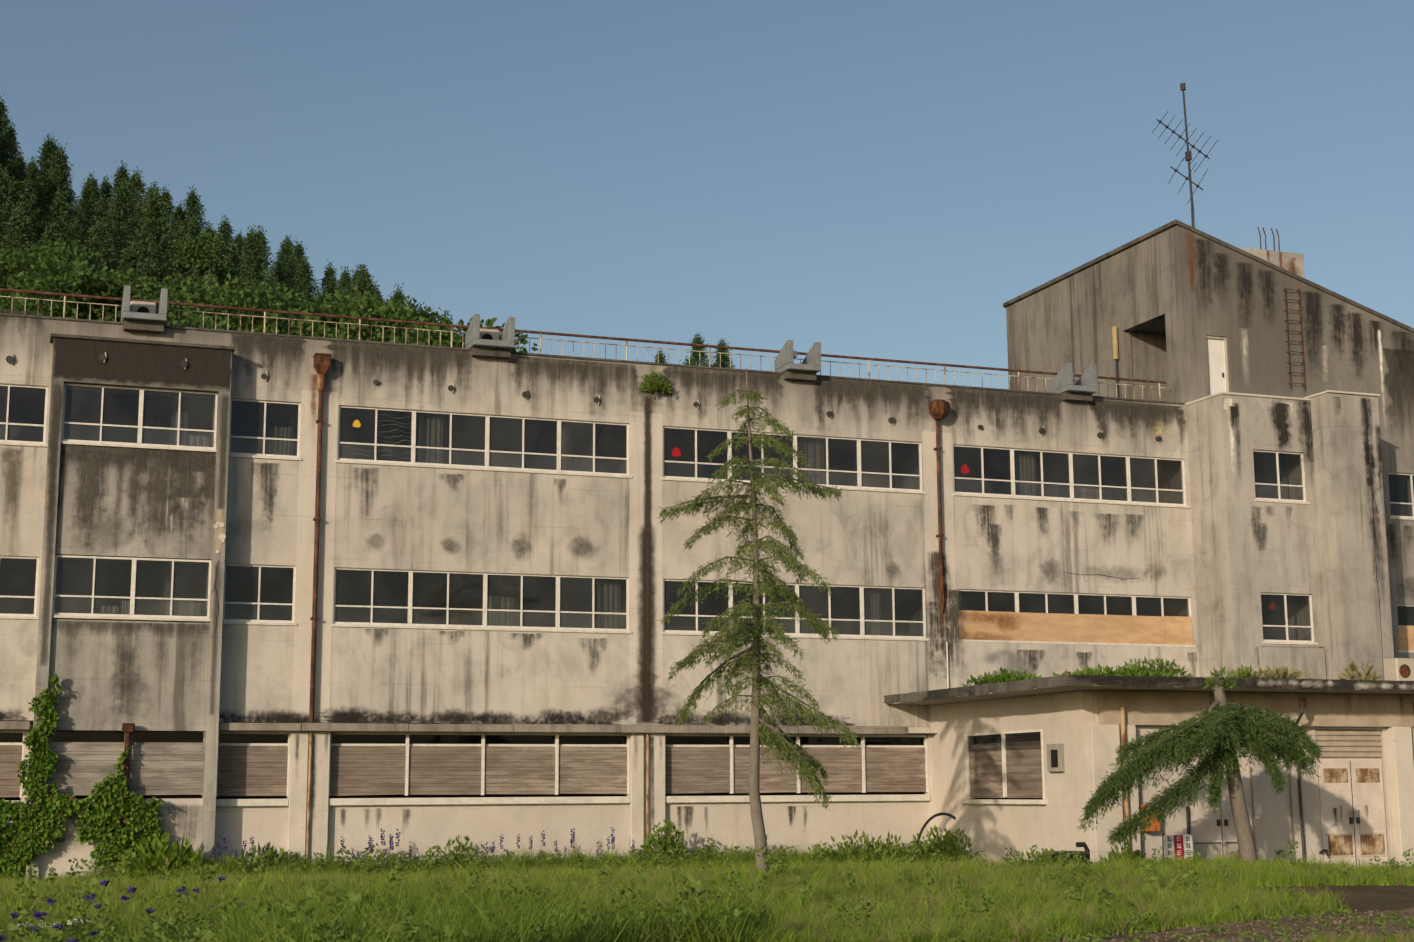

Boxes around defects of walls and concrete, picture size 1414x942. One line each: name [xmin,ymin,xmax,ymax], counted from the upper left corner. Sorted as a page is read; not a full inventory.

damp [41,333,305,693]
damp [219,356,751,804]
damp [664,366,782,413]
damp [1197,239,1273,318]
damp [1305,292,1414,558]
damp [770,715,854,726]